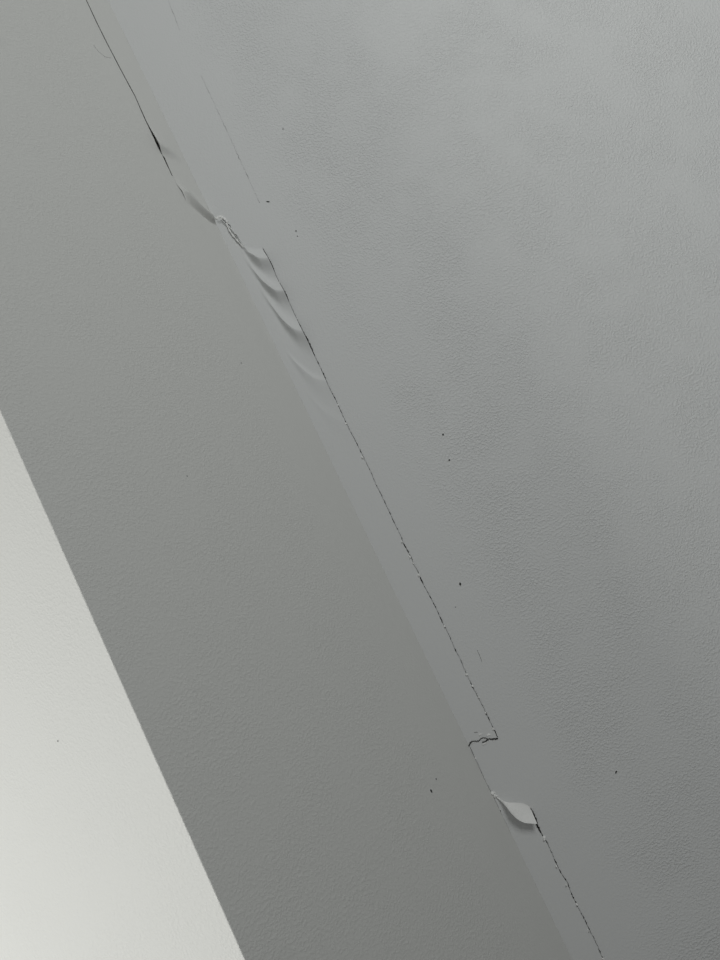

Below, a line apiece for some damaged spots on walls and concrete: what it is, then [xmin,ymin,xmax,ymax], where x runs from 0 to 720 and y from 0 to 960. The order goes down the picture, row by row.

crack [86,0,183,193]
crack [263,249,498,773]
crack [530,808,605,960]